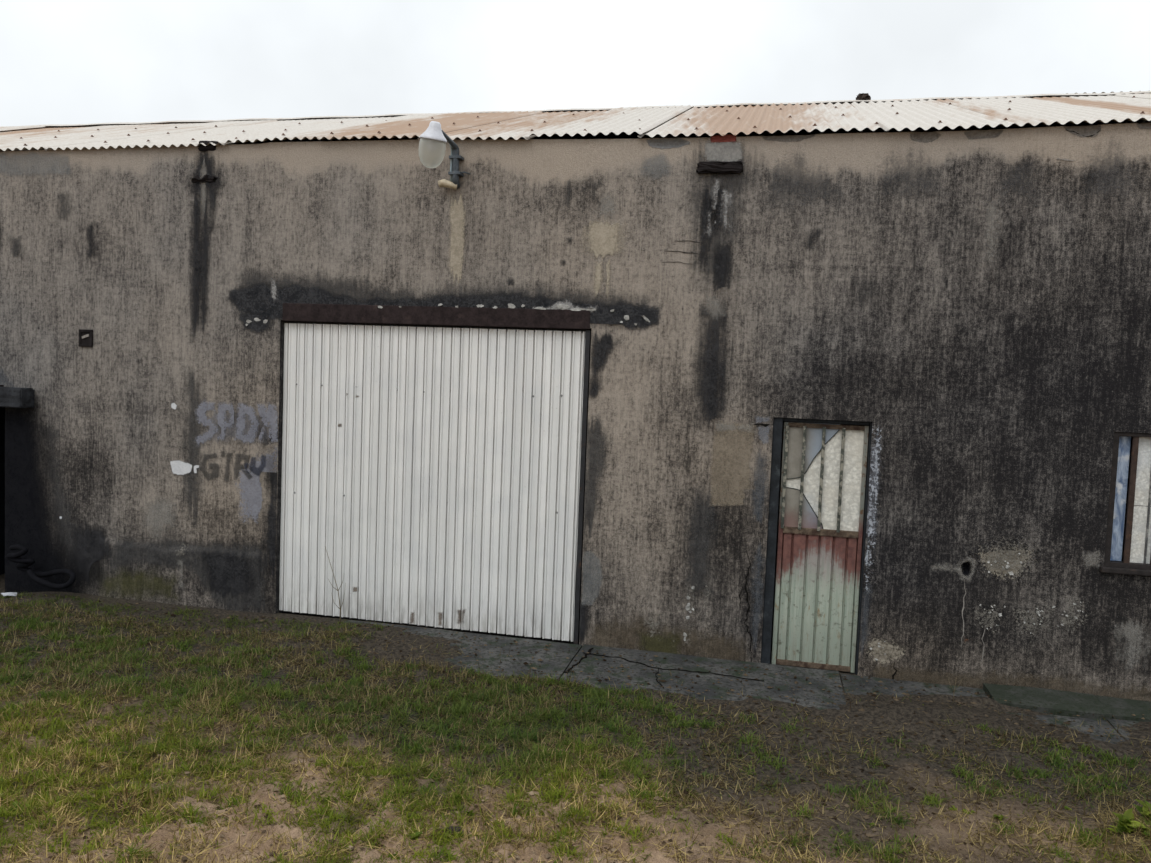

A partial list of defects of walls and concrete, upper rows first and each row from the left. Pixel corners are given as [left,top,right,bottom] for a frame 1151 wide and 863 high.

damp [188,151,224,336]
damp [229,193,660,398]
damp [692,152,749,290]
damp [694,303,733,425]
damp [183,372,200,528]
damp [584,418,606,535]
damp [579,603,589,640]
crack [564,547,764,681]
flaking render [865,638,906,665]
crack [961,579,986,661]
peeling [974,536,1046,582]